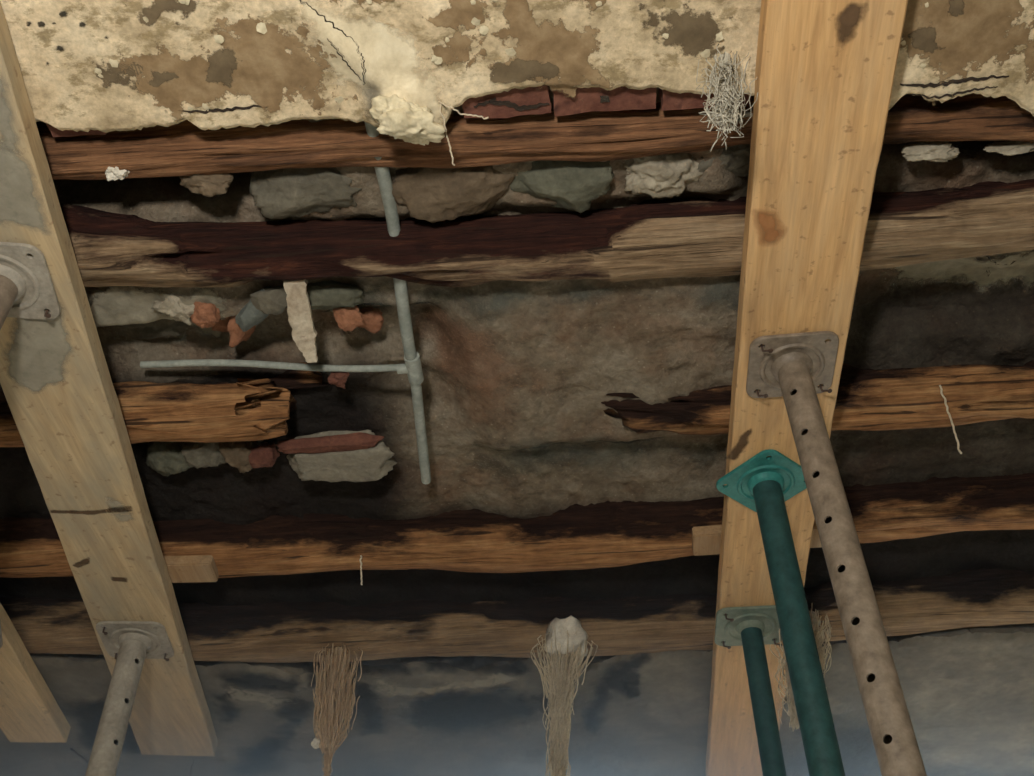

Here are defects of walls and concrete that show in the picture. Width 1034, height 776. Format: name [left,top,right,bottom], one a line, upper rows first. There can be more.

crack [178,105,269,114]
crack [300,0,366,85]
crack [900,75,1009,99]
peeling [900,0,1034,99]